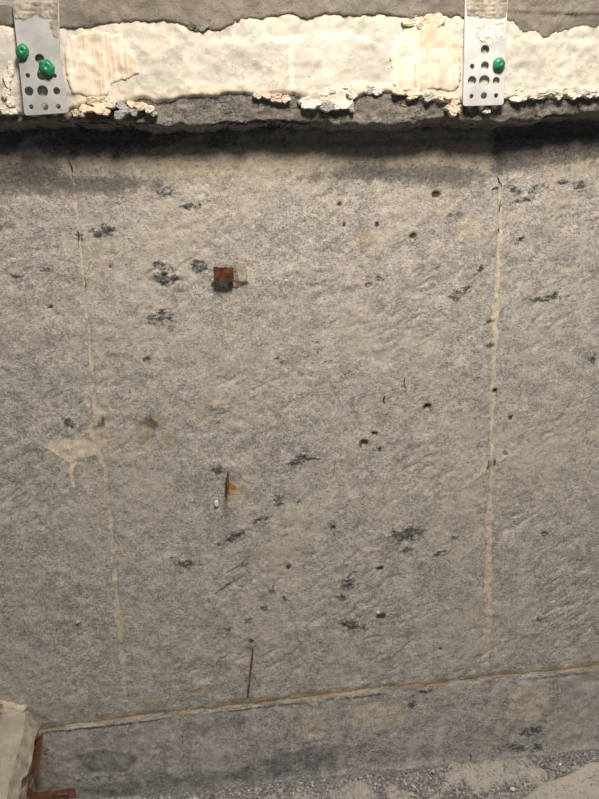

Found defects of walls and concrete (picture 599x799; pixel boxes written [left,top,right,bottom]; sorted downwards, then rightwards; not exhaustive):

peeling [187,16,214,32]
peeling [401,13,445,30]
peeling [0,61,20,115]
peeling [71,96,158,121]
peeling [252,84,461,117]
peeling [504,86,599,103]
crack [69,161,128,700]
crack [460,177,507,670]
spalling [0,700,27,714]
crack [44,717,169,733]